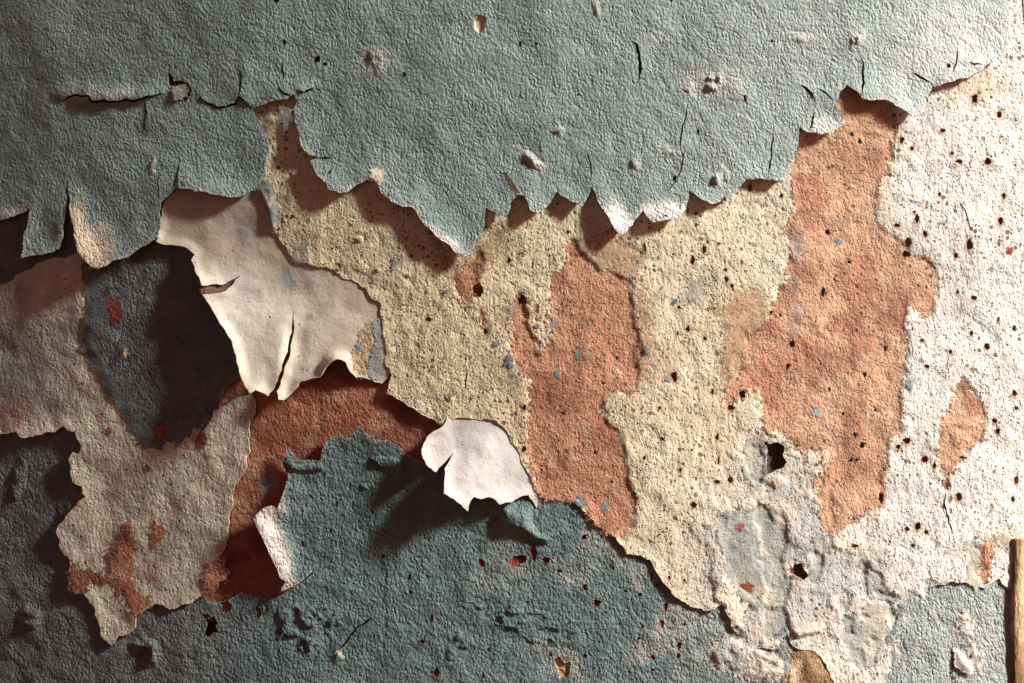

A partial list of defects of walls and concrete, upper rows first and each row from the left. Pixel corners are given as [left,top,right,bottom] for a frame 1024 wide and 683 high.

crack [56,93,161,121]
crack [633,42,642,82]
peeling [458,3,1011,537]
peeling [0,62,645,646]
peeling [713,501,833,683]
peeling [840,544,899,668]
peeling [963,538,996,590]